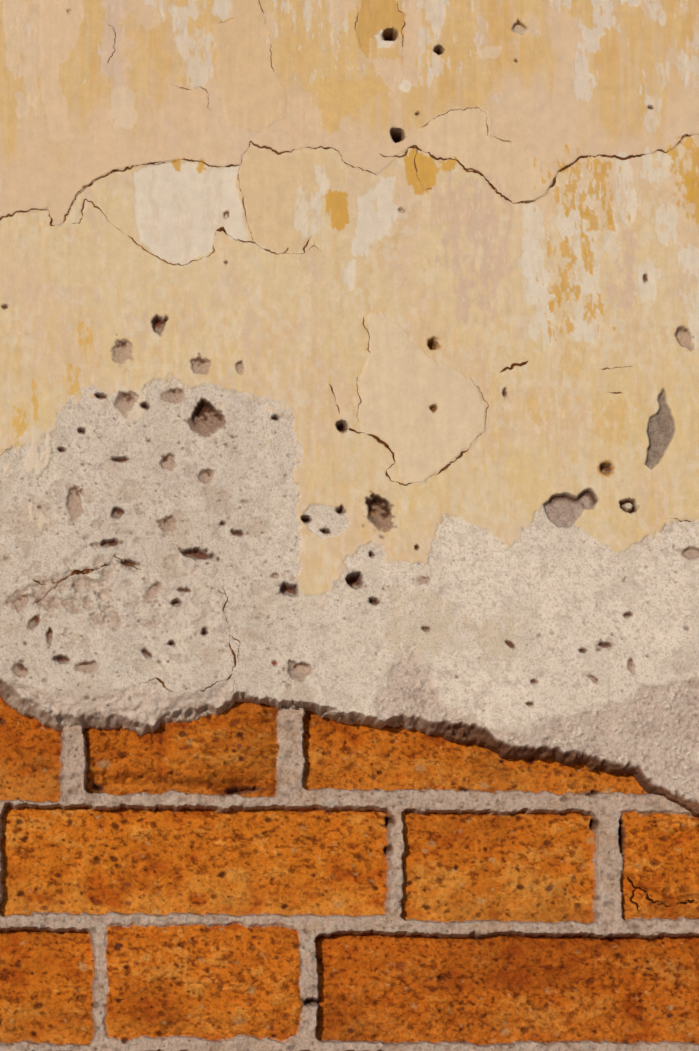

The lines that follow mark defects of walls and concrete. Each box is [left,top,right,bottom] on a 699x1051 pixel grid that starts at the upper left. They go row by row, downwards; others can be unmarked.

peeling [2,0,451,268]
crack [0,107,699,266]
peeling [342,175,406,298]
spalling [110,332,136,374]
crack [329,378,489,486]
peeling [354,313,488,487]
crack [501,361,528,372]
flaking render [0,352,699,921]